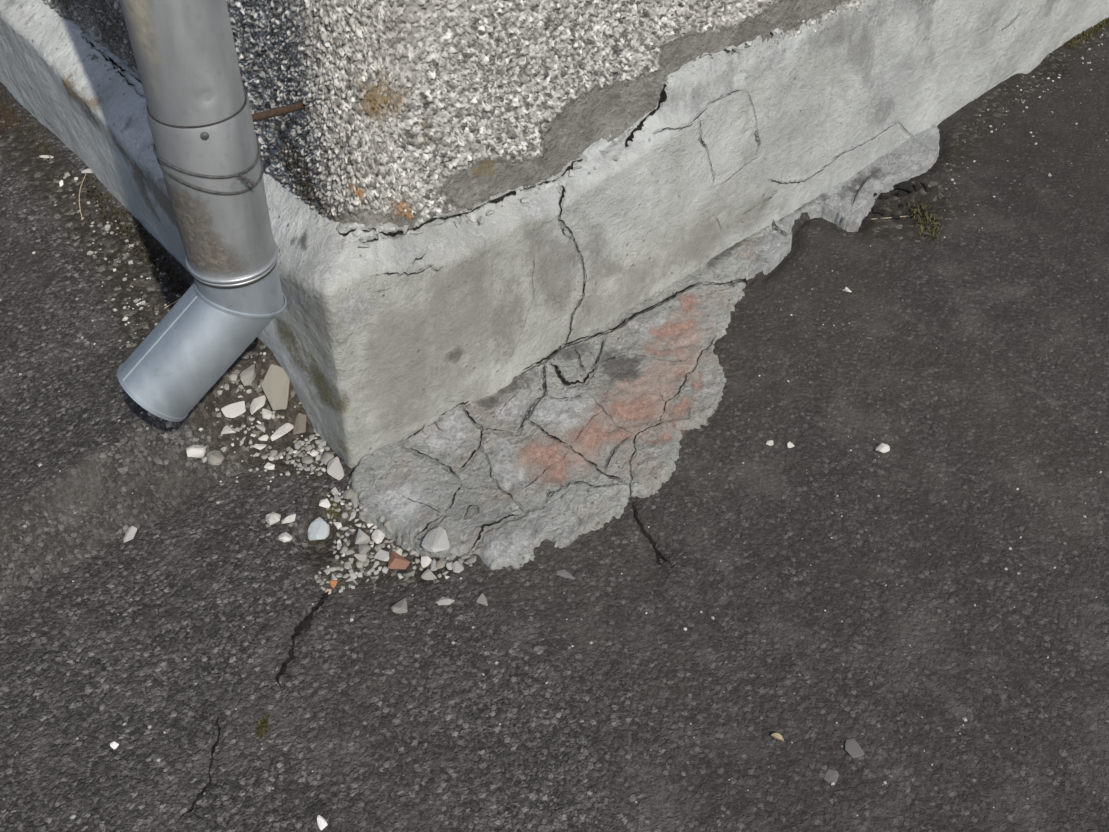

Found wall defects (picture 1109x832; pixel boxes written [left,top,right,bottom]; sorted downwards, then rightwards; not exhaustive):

flaking render [336,184,423,248]
flaking render [440,0,848,227]
crack [625,79,761,183]
crack [747,122,914,241]
crack [338,159,754,568]
crack [276,587,330,687]
crack [177,712,221,823]